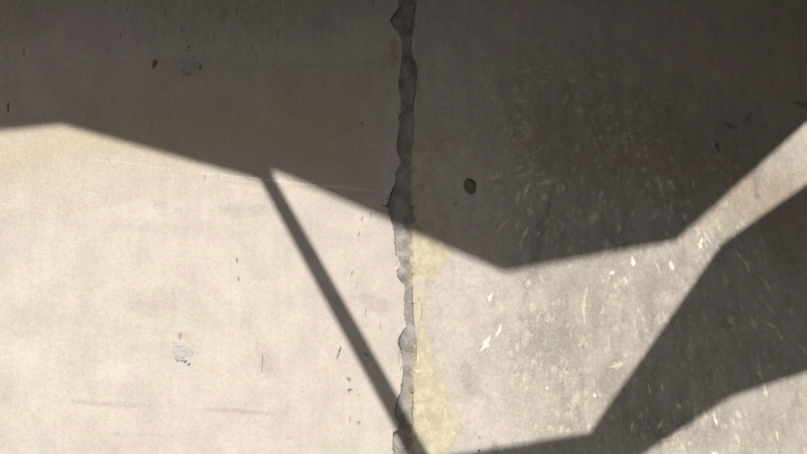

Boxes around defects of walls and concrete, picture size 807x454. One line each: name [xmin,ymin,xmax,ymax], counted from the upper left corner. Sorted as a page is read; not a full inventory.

damp [403,136,463,454]
damp [467,42,807,454]